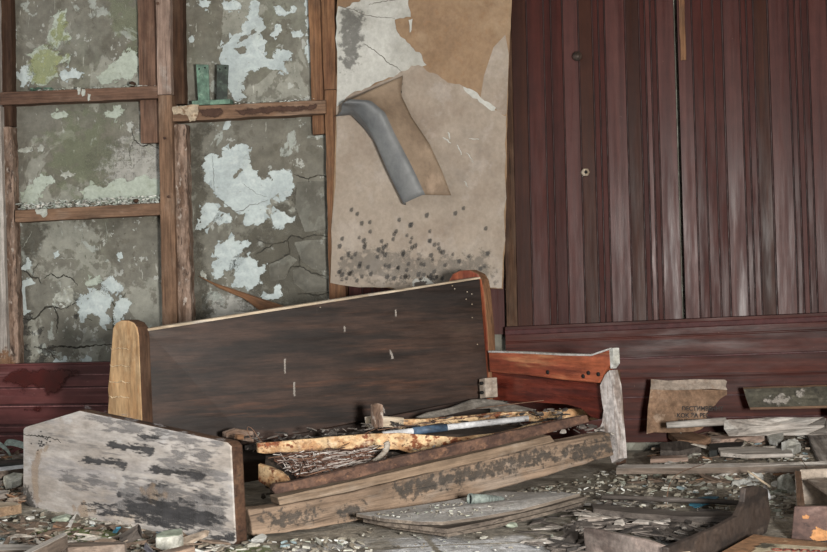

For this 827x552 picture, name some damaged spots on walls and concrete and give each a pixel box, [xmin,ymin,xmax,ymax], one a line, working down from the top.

peeling [16,8,84,87]
peeling [96,47,139,85]
peeling [219,0,310,102]
water stain [238,104,317,115]
crack [23,263,125,359]
peeling [15,170,160,210]
peeling [52,274,132,331]
peeling [195,143,295,300]
water stain [191,108,372,320]
crack [258,234,329,296]
water stain [376,218,470,280]
water stain [3,313,79,395]